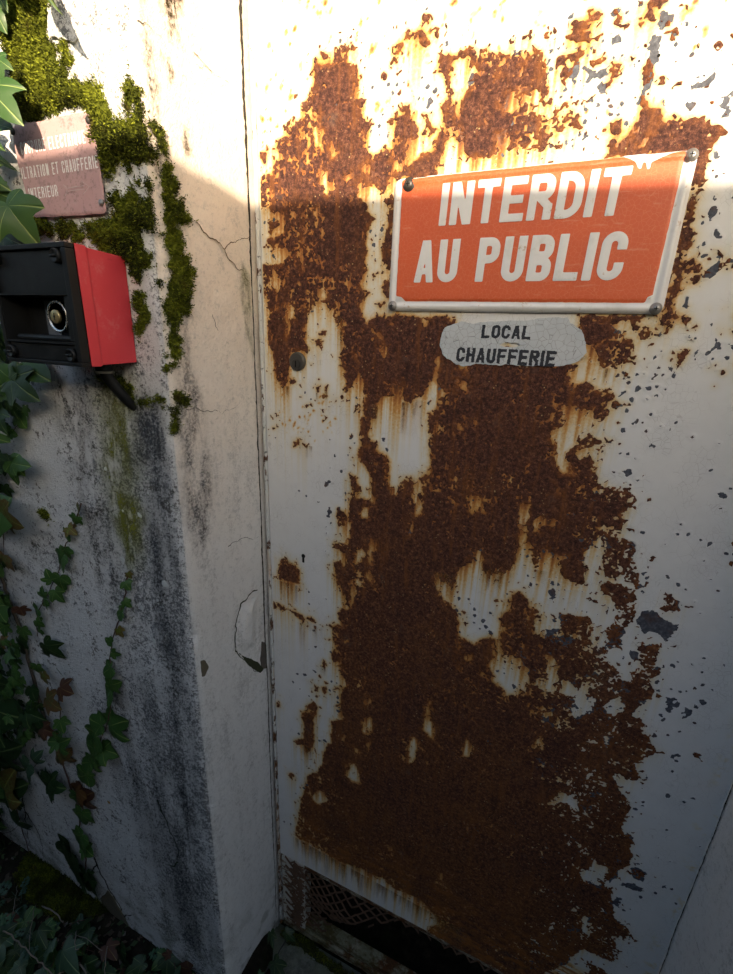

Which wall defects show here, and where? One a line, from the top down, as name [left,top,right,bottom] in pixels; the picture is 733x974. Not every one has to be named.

corrosion [565,8,604,43]
peeling [509,0,716,163]
peeling [710,85,733,118]
corrosion [604,95,728,334]
water stain [64,382,172,596]
water stain [180,428,211,531]
corrosion [260,41,665,974]
flaking render [234,590,266,673]
peeling [441,549,701,674]
peeling [645,664,713,738]
crack [659,785,733,974]